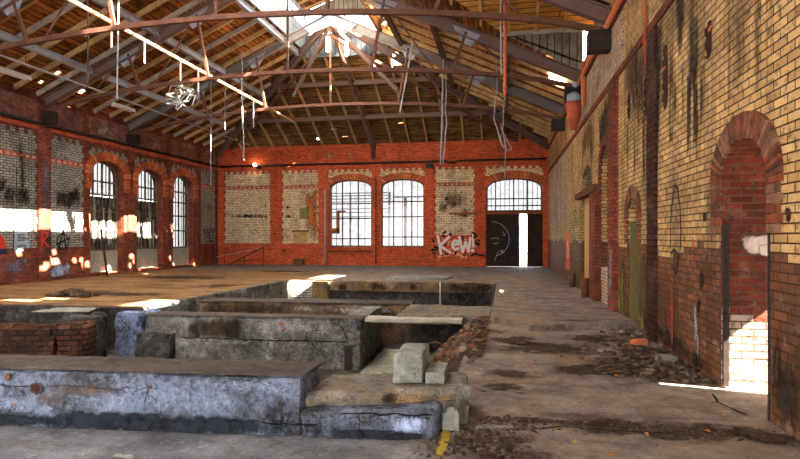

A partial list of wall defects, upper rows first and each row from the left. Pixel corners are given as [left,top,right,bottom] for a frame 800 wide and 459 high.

water stain [669,52,703,151]
water stain [625,119,644,176]
crack [0,380,161,406]
crack [338,412,434,430]